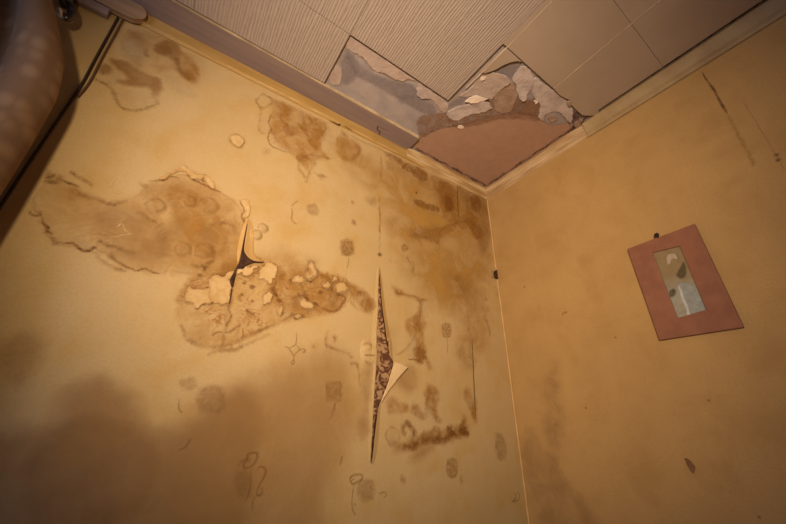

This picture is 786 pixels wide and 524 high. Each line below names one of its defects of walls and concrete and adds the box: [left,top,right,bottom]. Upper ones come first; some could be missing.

flaking render [346,36,573,188]
leakage [374,173,487,301]
peeling [185,262,277,309]
peeling [292,263,316,283]
peeling [295,298,313,319]
peeling [323,276,348,292]